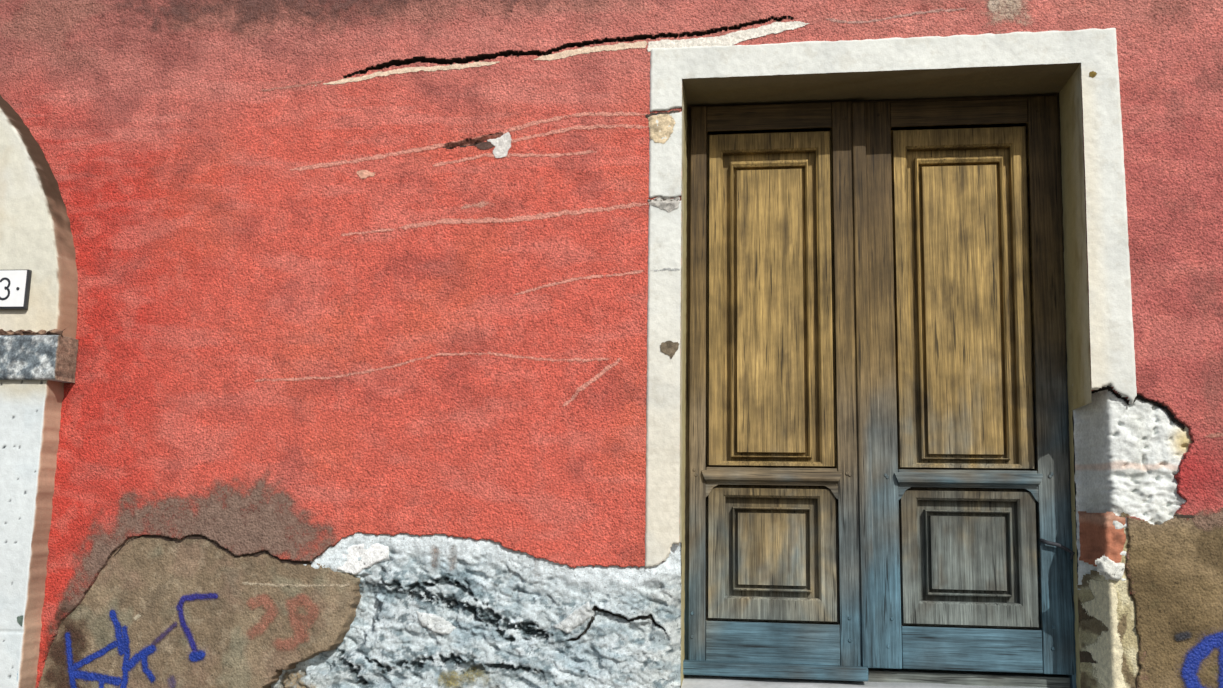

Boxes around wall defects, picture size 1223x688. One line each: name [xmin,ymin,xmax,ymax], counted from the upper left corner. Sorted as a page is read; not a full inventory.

crack [262,8,966,92]
flaking render [645,110,681,144]
water stain [46,479,335,688]
flaking render [37,532,681,688]
flaking render [1073,385,1223,688]